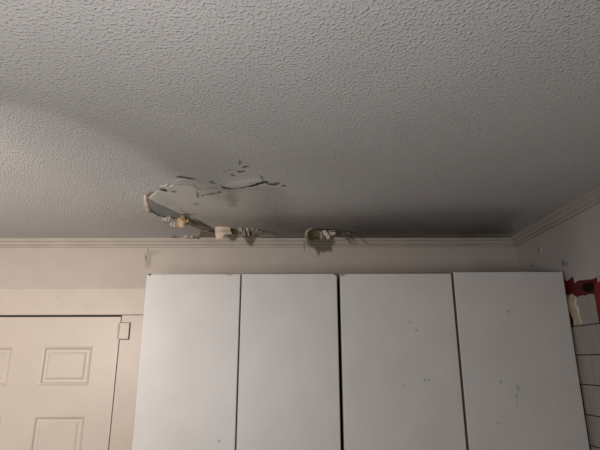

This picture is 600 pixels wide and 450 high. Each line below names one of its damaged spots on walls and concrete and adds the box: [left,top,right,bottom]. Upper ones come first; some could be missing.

crack [221,160,287,190]
peeling [144,176,276,239]
peeling [305,228,354,245]
peeling [564,275,600,326]